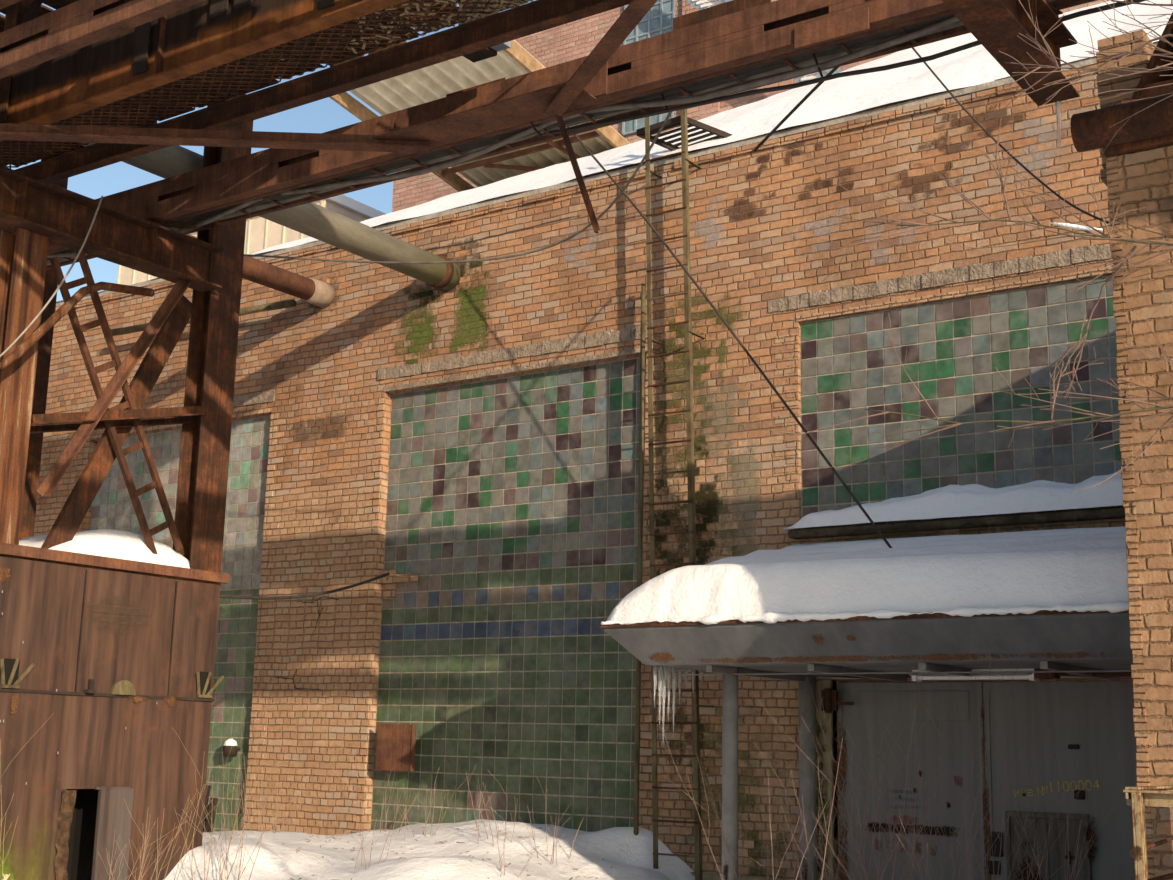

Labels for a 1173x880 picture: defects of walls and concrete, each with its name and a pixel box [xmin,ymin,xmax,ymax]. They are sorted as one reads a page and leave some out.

spalling [724,154,776,221]
spalling [783,140,823,164]
spalling [799,168,854,199]
damp [398,290,438,365]
damp [450,286,487,352]
damp [654,325,727,475]
rust [1129,846,1143,861]